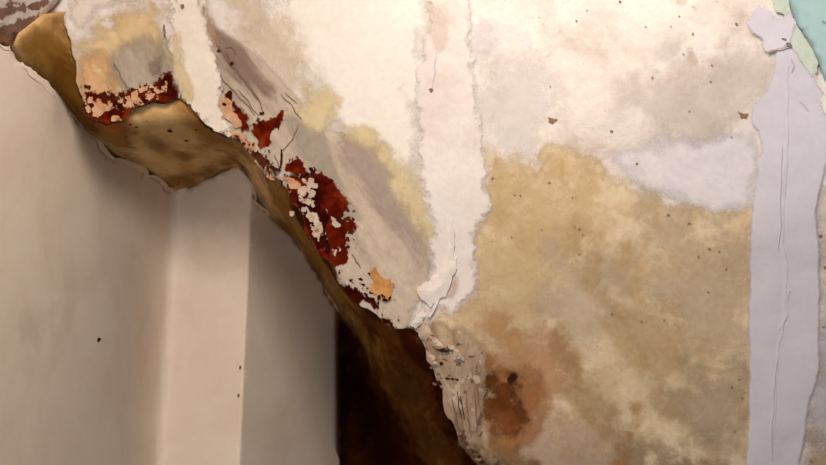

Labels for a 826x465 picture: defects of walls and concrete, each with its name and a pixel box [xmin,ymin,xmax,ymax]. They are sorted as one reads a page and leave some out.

spalling [20,62,188,192]
corrosion [80,71,181,134]
damp [20,1,250,177]
flaking render [112,39,172,94]
corrosion [218,90,284,149]
corrosion [283,156,400,328]
flaking render [212,30,540,465]
damp [263,173,506,465]
damp [432,143,753,465]